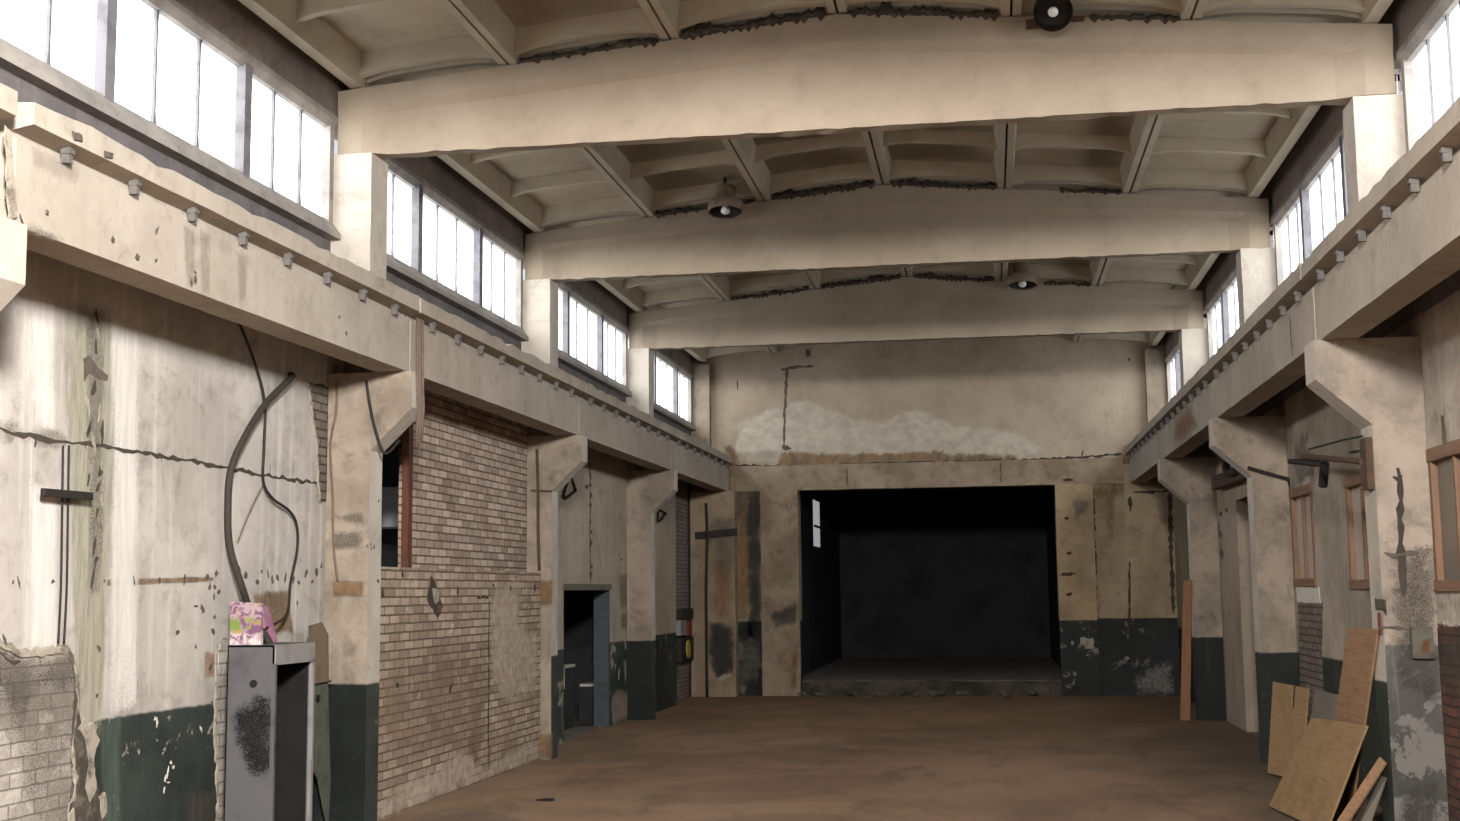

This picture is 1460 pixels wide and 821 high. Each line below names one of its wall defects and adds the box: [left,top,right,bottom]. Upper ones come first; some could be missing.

crack [0,416,318,498]
damp [708,398,1041,695]
flaking render [0,633,107,821]
peeling [1071,637,1094,649]
peeling [1126,656,1176,696]
flaking render [1296,587,1323,725]
flaking render [1436,614,1460,821]